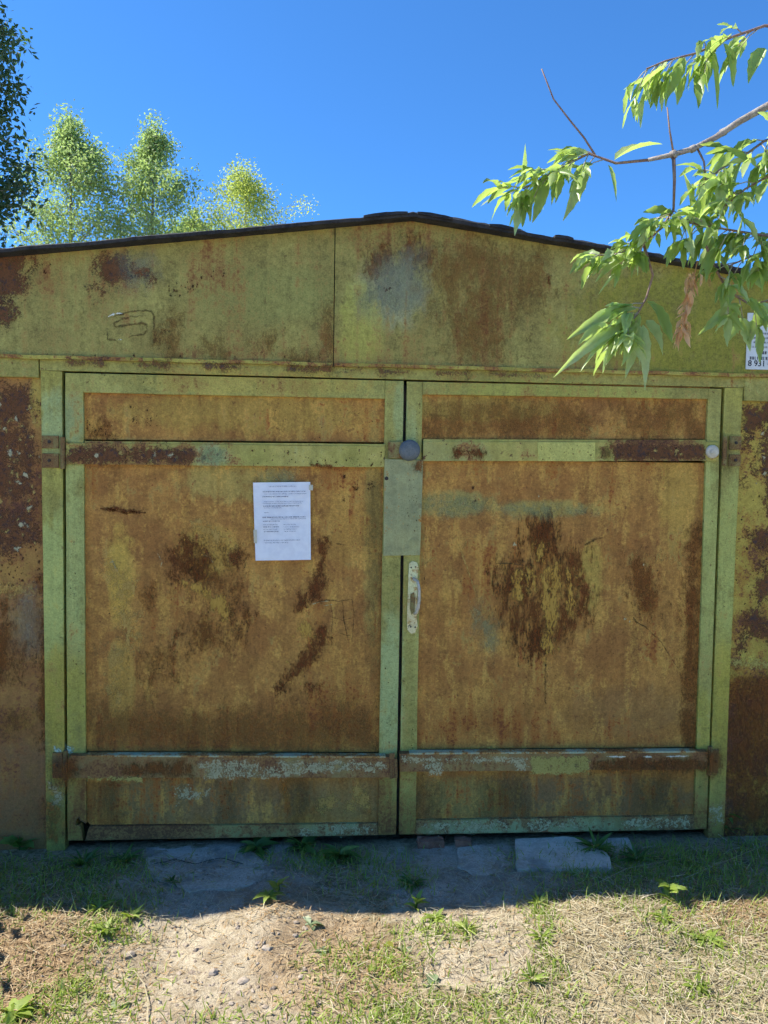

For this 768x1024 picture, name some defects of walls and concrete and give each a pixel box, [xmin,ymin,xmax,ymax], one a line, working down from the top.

corrosion [0,255,51,329]
corrosion [84,249,157,305]
corrosion [128,528,258,693]
corrosion [293,536,333,612]
corrosion [486,509,603,703]
corrosion [273,623,336,704]
corrosion [592,524,725,778]
peeling [198,758,386,782]
peeling [401,728,530,776]